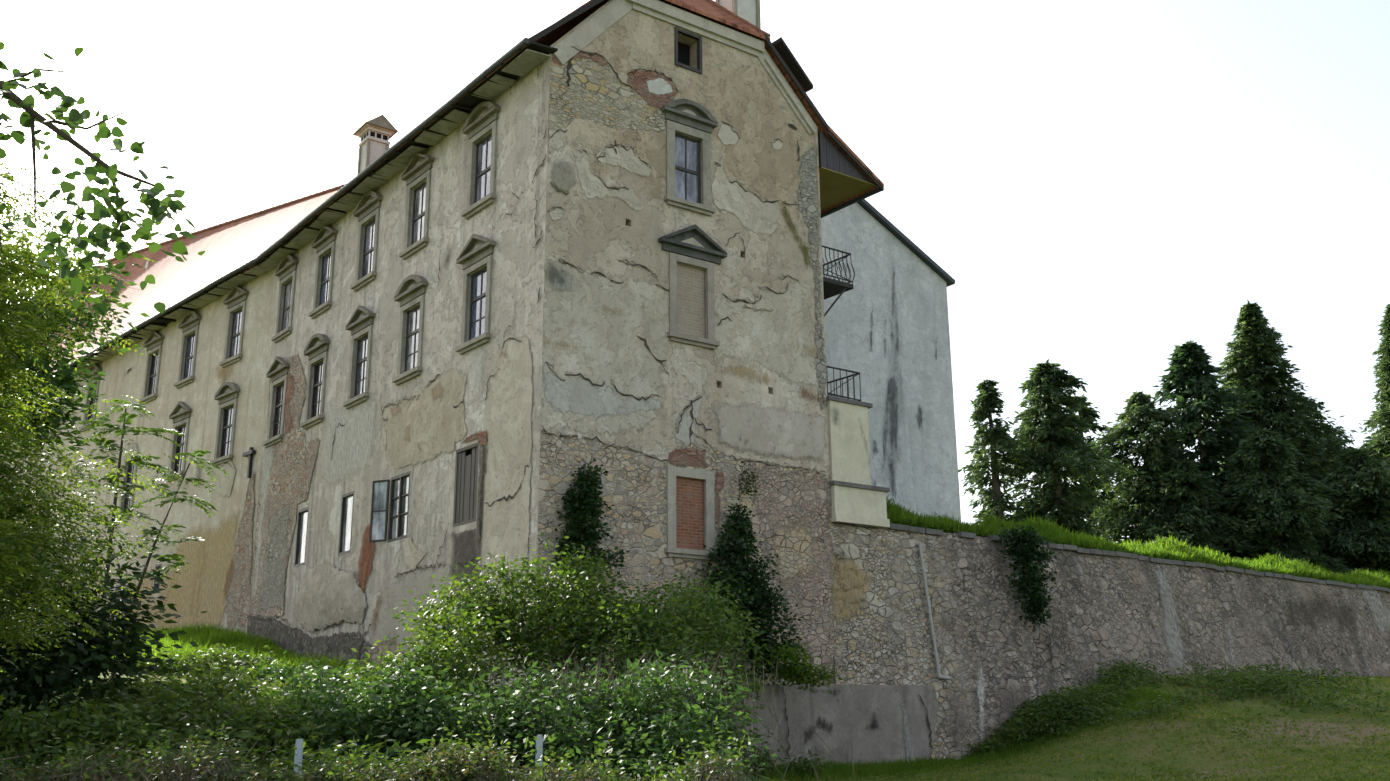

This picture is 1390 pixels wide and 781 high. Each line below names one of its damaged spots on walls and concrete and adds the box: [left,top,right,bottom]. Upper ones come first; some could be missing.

flaking render [548,45,680,211]
flaking render [718,120,740,145]
flaking render [219,354,477,684]
flaking render [381,258,837,691]
crack [637,335,669,374]
crack [689,400,712,446]
flaking render [711,147,827,409]
damp [873,377,898,492]